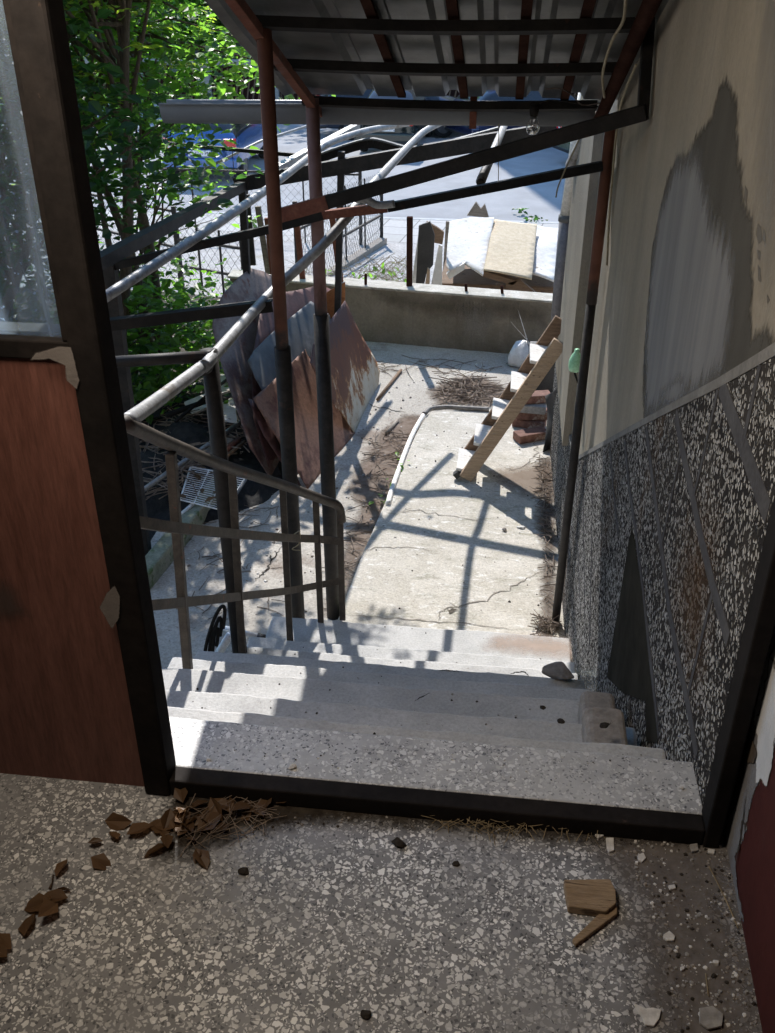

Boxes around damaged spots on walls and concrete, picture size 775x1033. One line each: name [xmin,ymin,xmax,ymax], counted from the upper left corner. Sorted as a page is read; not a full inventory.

damp [643,77,775,418]
crack [347,571,541,629]
peeling [689,628,775,922]